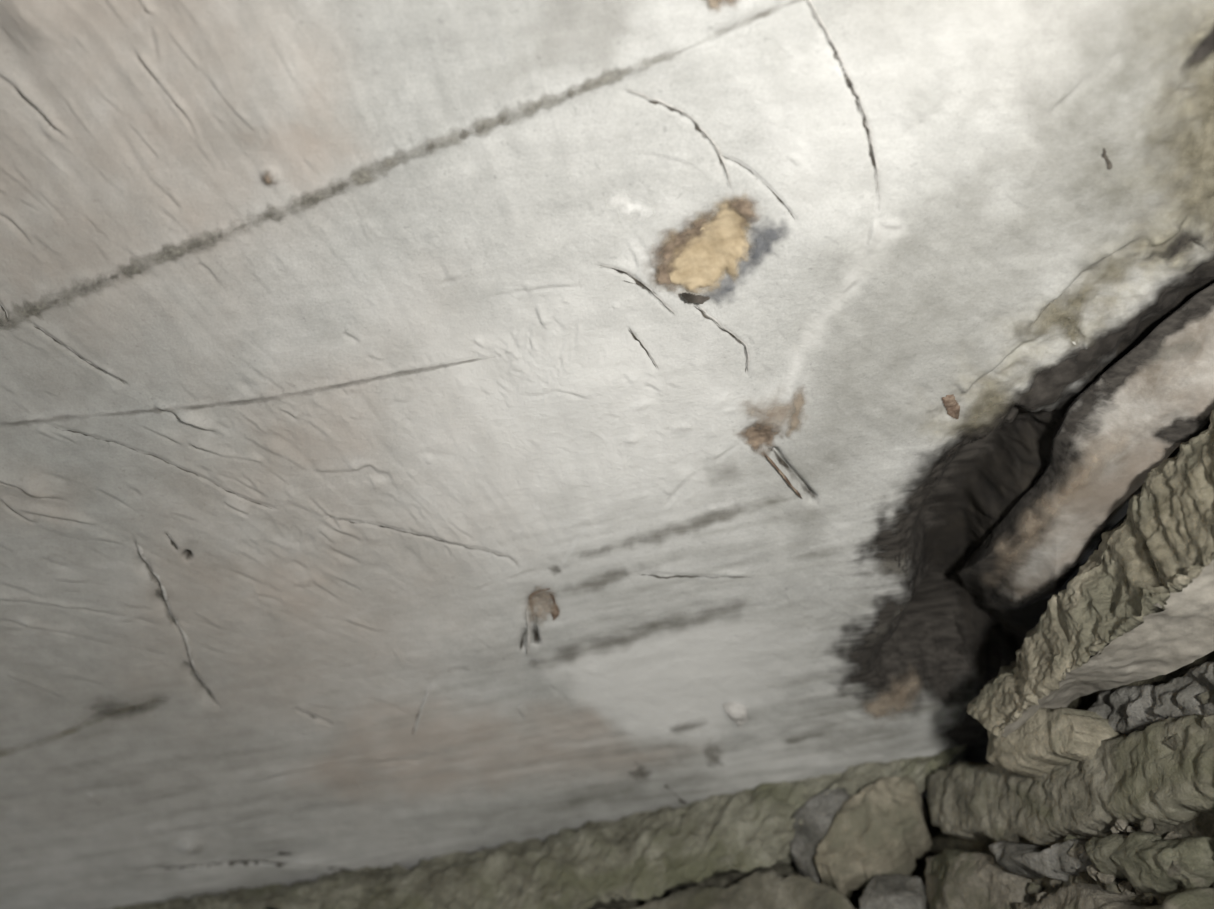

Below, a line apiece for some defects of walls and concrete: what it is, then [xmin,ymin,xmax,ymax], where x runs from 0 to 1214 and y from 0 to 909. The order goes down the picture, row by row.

crack [626,89,794,218]
crack [807,0,880,207]
damp [1187,29,1214,66]
damp [1152,233,1202,258]
crack [0,303,126,384]
spalling [942,394,960,419]
damp [837,257,1214,764]
crack [134,534,219,704]